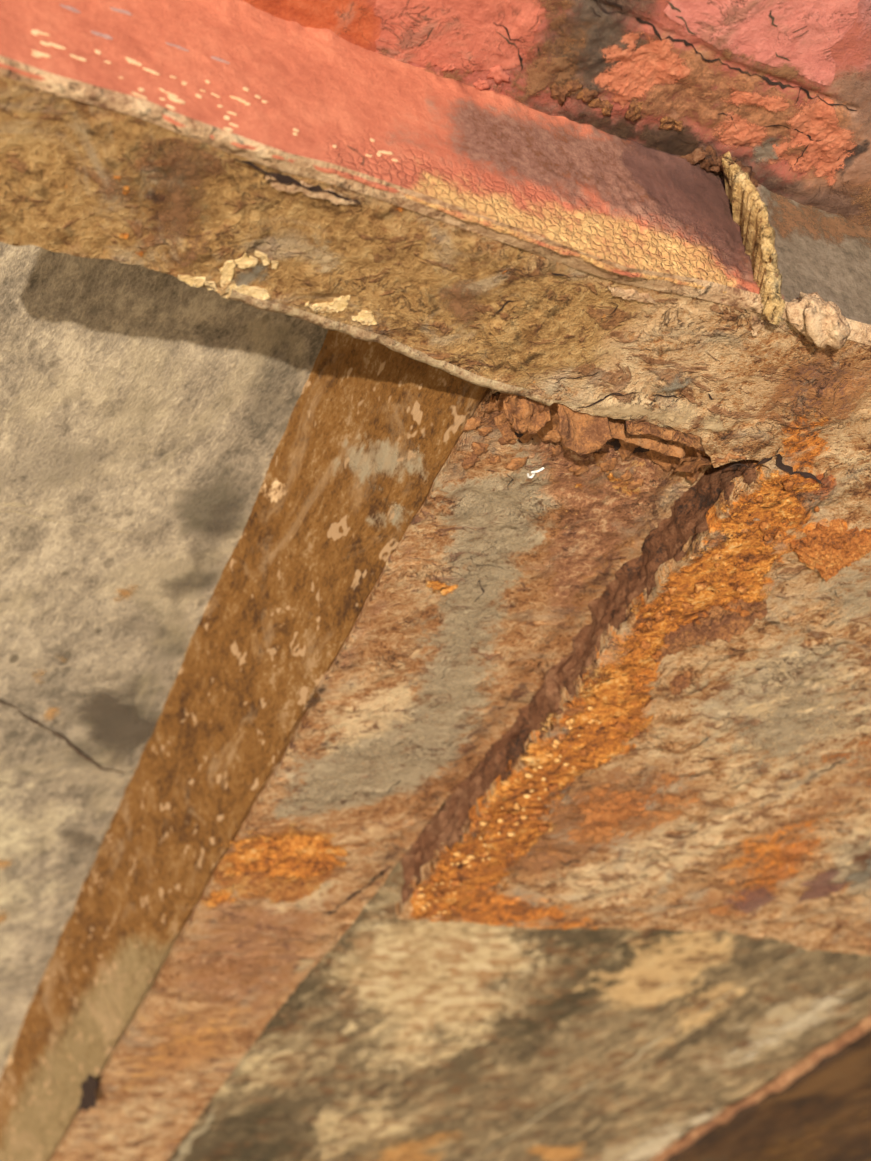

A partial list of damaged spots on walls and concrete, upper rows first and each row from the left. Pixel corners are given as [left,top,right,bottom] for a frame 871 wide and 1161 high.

crack [493,22,564,71]
water stain [561,0,648,90]
crack [592,0,857,171]
rust [425,0,871,271]
rust [265,174,357,205]
peeling [178,250,279,300]
peeling [305,295,377,326]
crack [723,448,825,485]
crack [470,547,504,602]
rust [404,470,820,921]
rust [202,830,349,909]
water stain [488,928,692,1067]